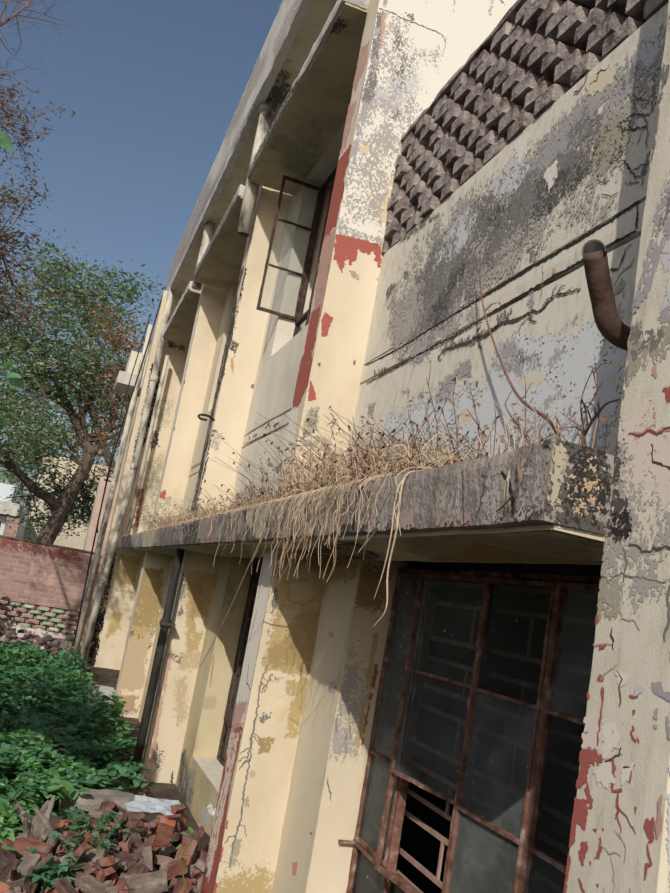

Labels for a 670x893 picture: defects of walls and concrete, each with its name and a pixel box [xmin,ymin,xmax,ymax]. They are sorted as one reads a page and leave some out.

water stain [225,0,328,183]
peeling [227,0,517,541]
water stain [336,0,670,621]
crack [366,93,652,384]
peeling [543,158,558,193]
peeling [541,438,568,509]
crack [628,426,670,470]
water stain [176,747,210,833]
water stain [172,569,217,727]
crack [225,664,269,868]
peeling [200,551,316,893]
peeling [563,713,635,893]